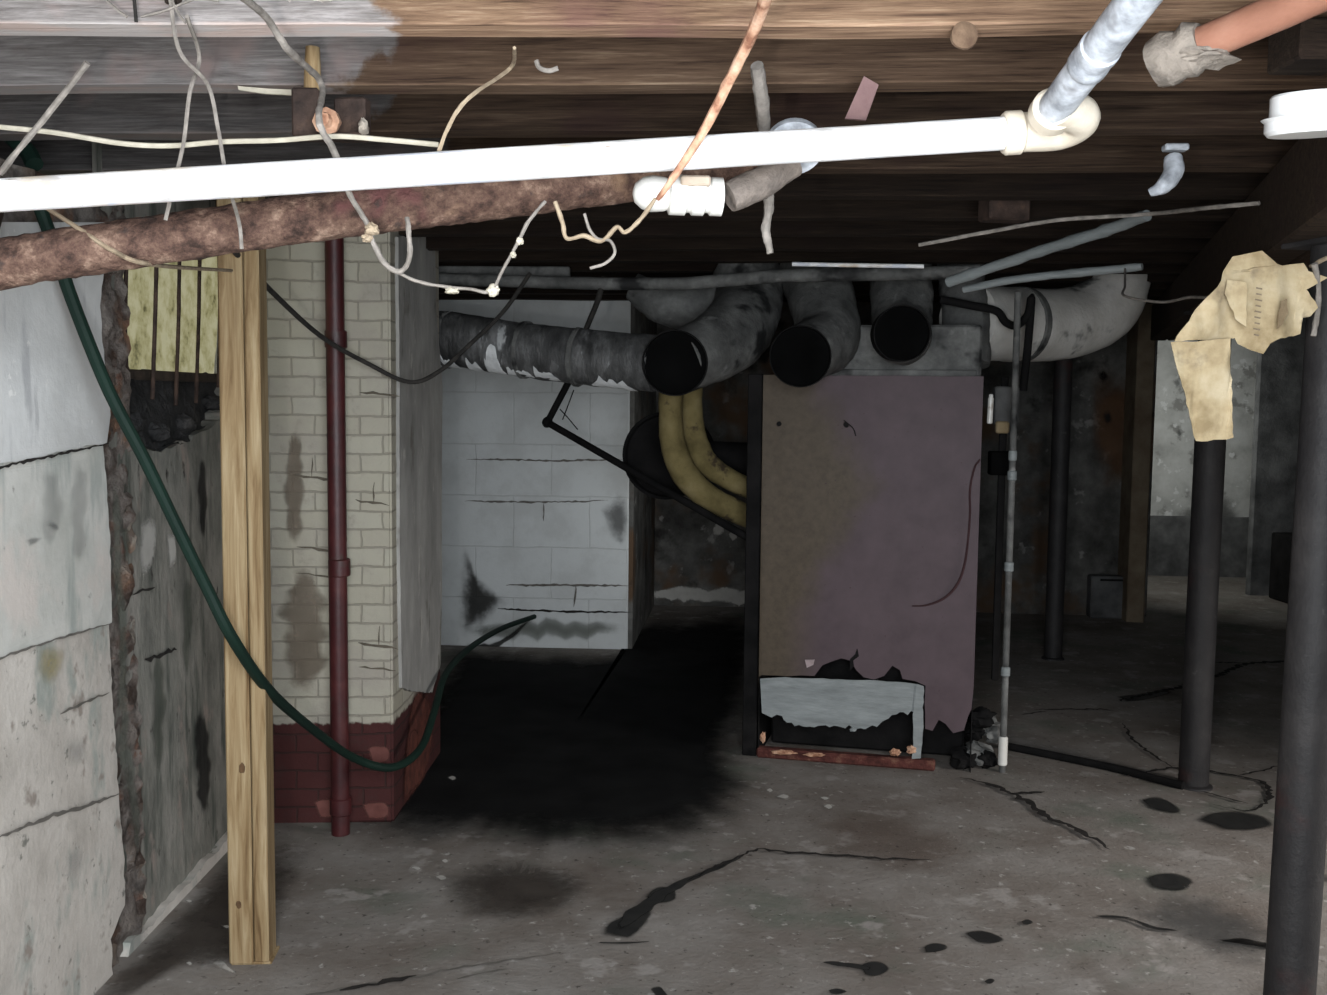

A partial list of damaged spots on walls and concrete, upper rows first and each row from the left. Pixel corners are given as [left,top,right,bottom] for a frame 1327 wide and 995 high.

crack [0,443,109,469]
crack [0,624,109,660]
crack [145,647,177,662]
crack [1214,660,1284,677]
crack [1026,684,1275,811]
crack [0,792,122,837]
crack [960,777,1109,849]
crack [687,848,929,881]
damp [459,867,573,914]